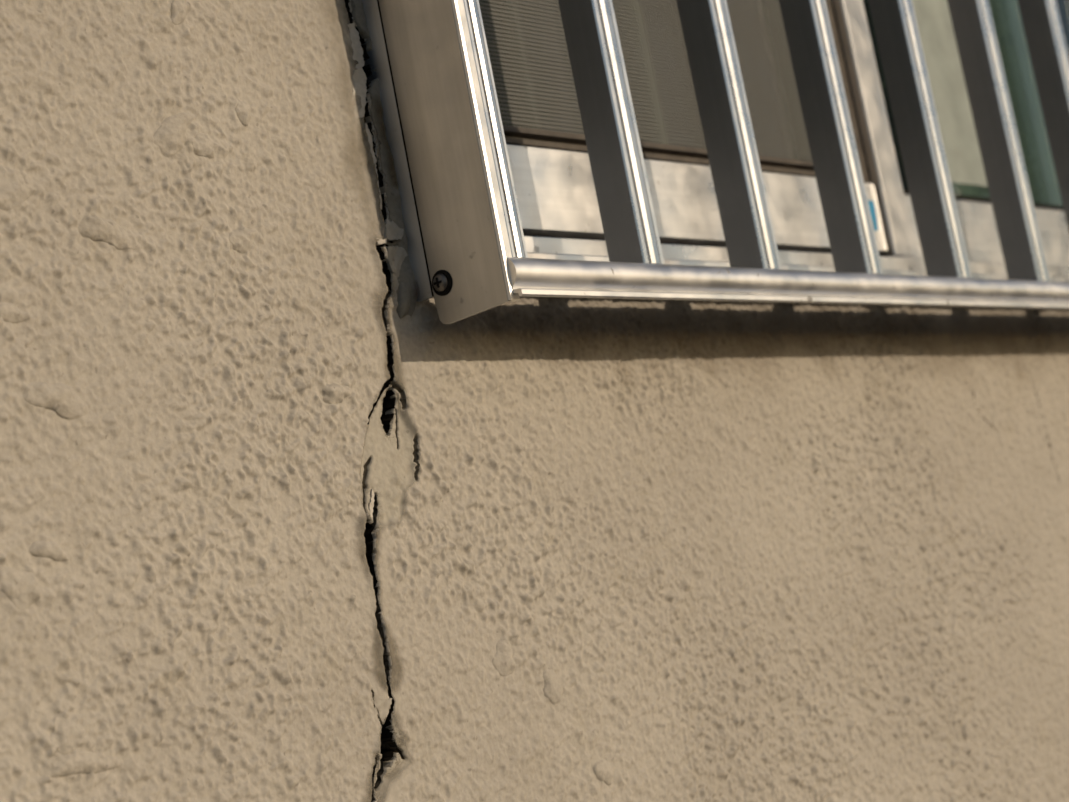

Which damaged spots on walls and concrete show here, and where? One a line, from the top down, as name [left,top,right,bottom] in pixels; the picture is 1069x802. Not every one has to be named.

peeling [347,23,408,276]
crack [344,0,420,480]
spalling [360,384,420,528]
crack [362,457,405,802]
spalling [372,694,410,802]